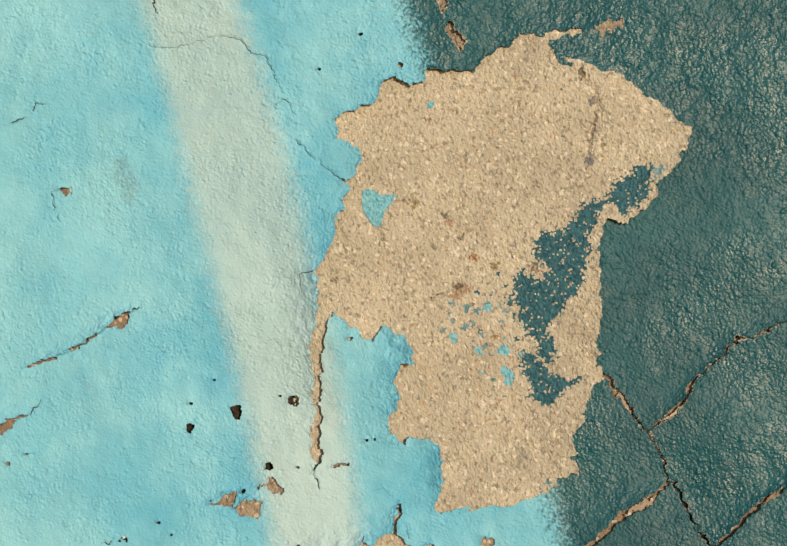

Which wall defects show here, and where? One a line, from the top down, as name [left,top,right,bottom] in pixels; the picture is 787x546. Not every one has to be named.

peeling [445,21,466,51]
peeling [286,27,692,546]
peeling [25,305,141,368]
spalling [0,411,28,435]
crack [565,321,787,546]
peeling [257,477,284,495]
peeling [210,491,263,519]